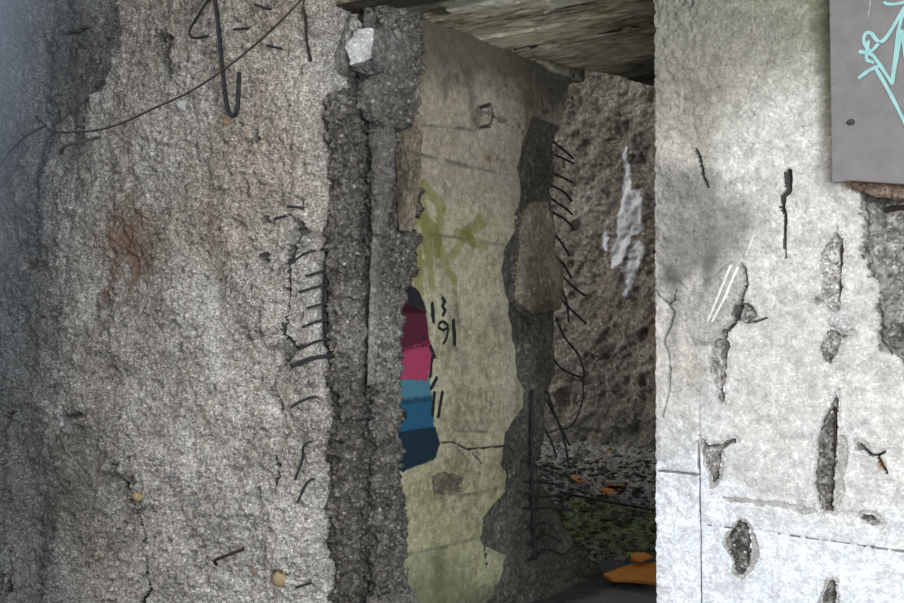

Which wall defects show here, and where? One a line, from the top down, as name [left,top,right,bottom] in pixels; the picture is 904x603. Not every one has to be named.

efflorescence [603,147,645,297]
spalling [807,227,848,314]
spalling [846,181,904,364]
spalling [480,116,656,603]
crack [657,288,677,418]
crack [110,463,153,603]
crack [658,426,730,603]
spalling [699,434,740,489]
spalling [722,518,760,580]
spalling [722,388,870,516]
spalling [817,577,840,603]
crack [764,532,904,553]